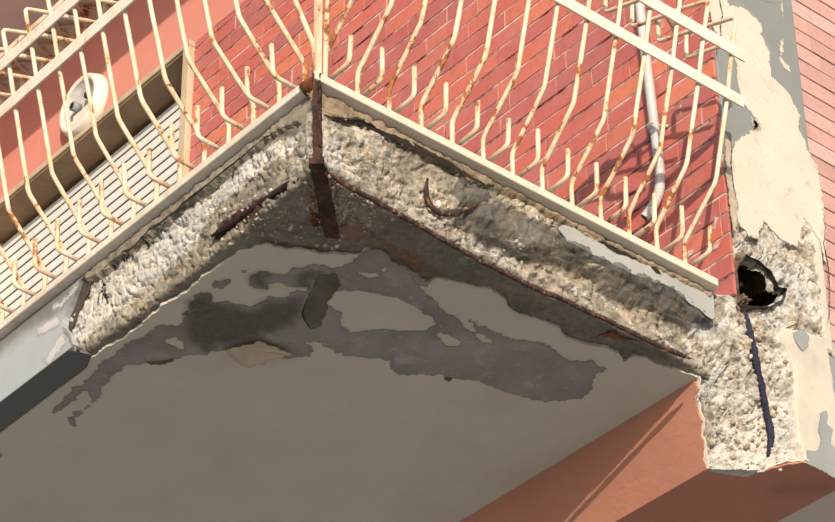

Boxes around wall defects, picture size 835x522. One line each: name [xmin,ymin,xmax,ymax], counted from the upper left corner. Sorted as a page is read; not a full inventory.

rust [213,196,263,241]
spalling [53,109,714,427]
spalling [704,295,725,329]
spalling [734,252,787,457]
peeling [709,0,827,261]